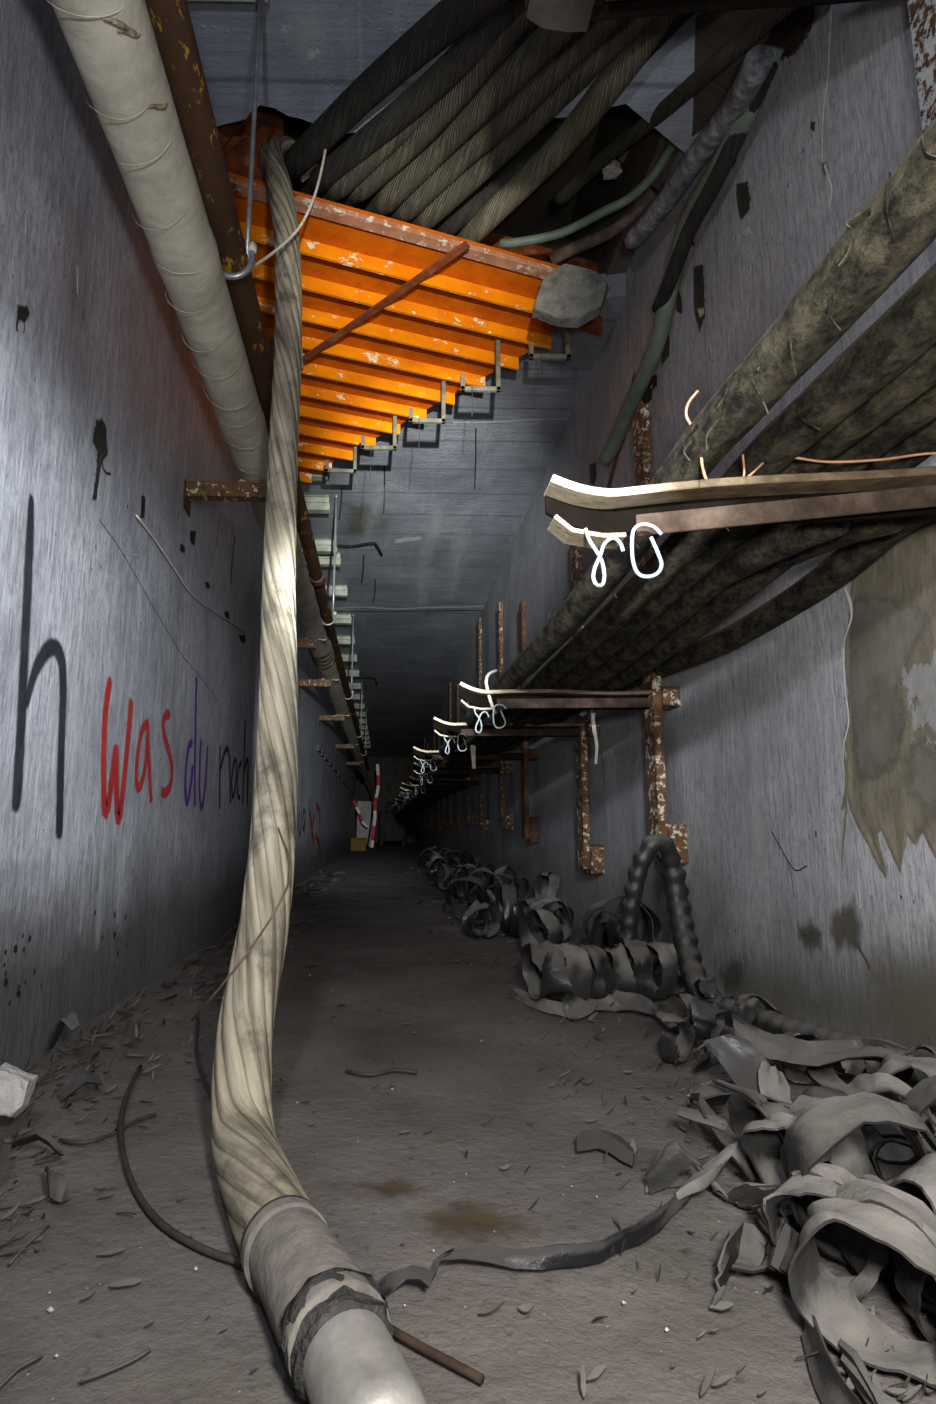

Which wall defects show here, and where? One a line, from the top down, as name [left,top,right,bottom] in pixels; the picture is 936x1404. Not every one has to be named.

peeling [842,521,936,909]